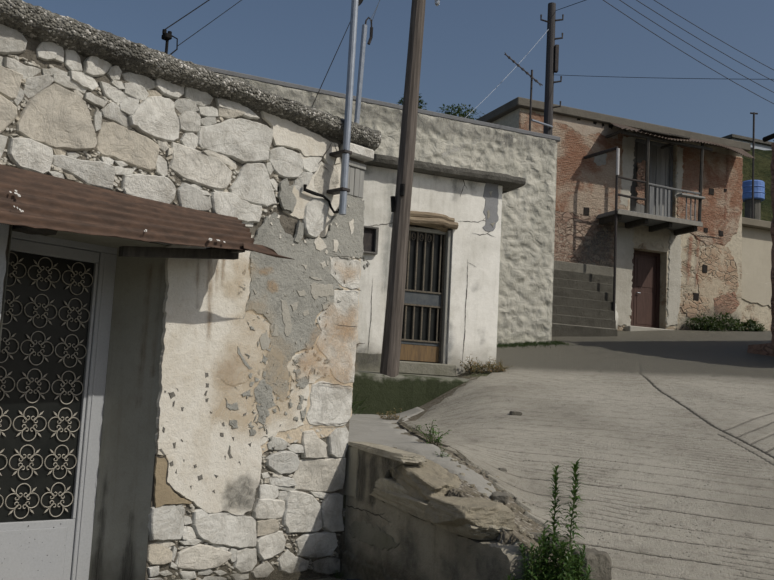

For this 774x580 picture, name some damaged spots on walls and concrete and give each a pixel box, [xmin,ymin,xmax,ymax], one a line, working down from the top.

flaking render [220,178,370,465]
flaking render [153,449,192,508]